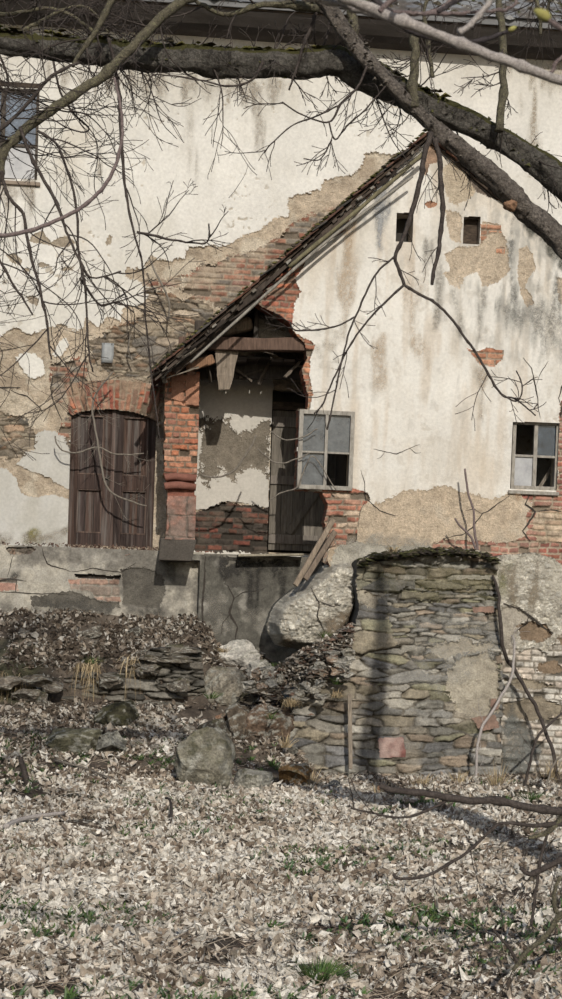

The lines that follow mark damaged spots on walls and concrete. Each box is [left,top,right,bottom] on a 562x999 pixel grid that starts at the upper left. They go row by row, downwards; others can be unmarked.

spalling [425,145,536,307]
spalling [0,151,397,555]
spalling [467,347,504,367]
flaking render [194,401,562,593]
crack [0,557,58,594]
crack [42,549,135,572]
spalling [30,566,166,609]
crack [201,556,257,640]
spalling [500,604,562,774]